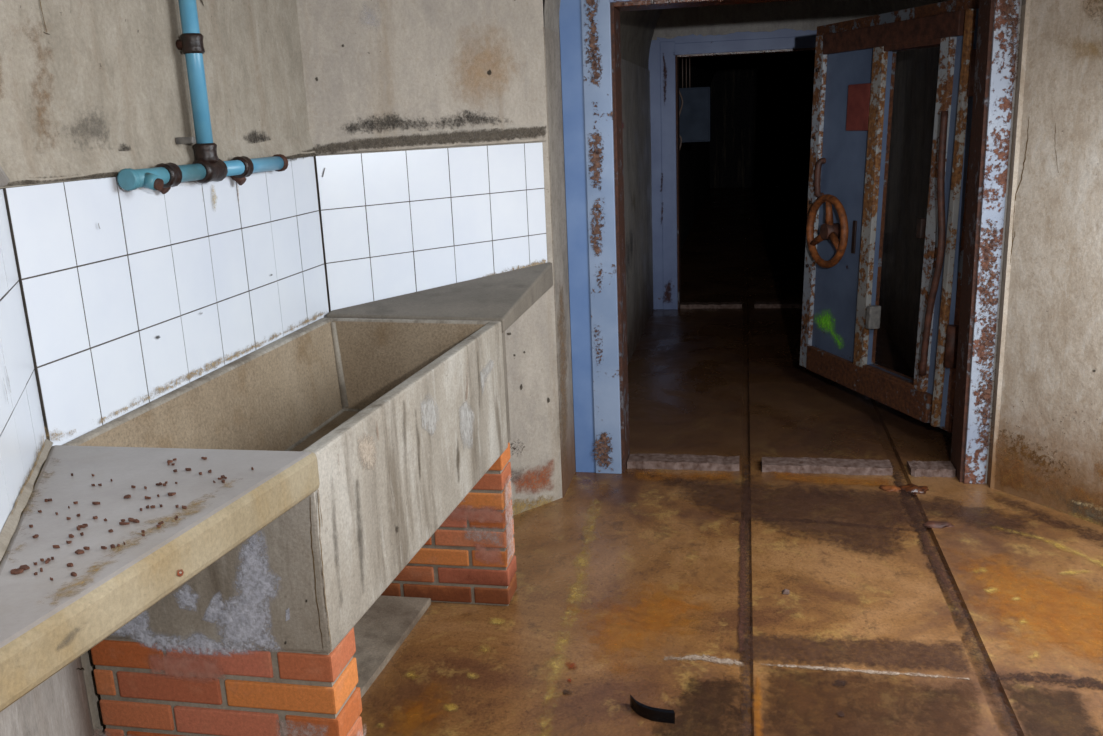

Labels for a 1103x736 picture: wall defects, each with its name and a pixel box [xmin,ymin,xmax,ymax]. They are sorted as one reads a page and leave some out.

rust [584,0,603,86]
rust [1003,0,1021,91]
damp [346,111,501,134]
rust [587,102,605,292]
rust [511,288,567,492]
efflorescence [111,531,280,680]